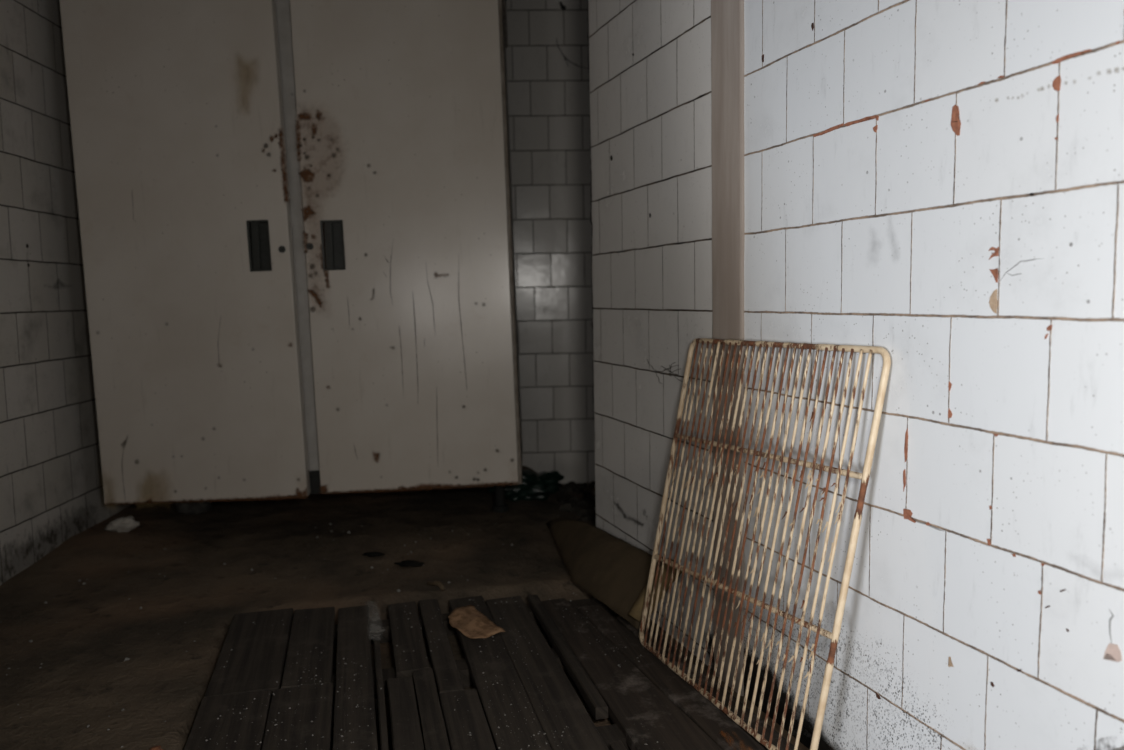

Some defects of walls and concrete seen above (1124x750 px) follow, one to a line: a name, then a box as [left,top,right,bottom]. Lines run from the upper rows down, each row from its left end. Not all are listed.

spalling [951,105,961,136]
corrosion [262,112,322,202]
corrosion [301,195,329,311]
spalling [989,247,999,314]
spalling [1103,643,1122,662]